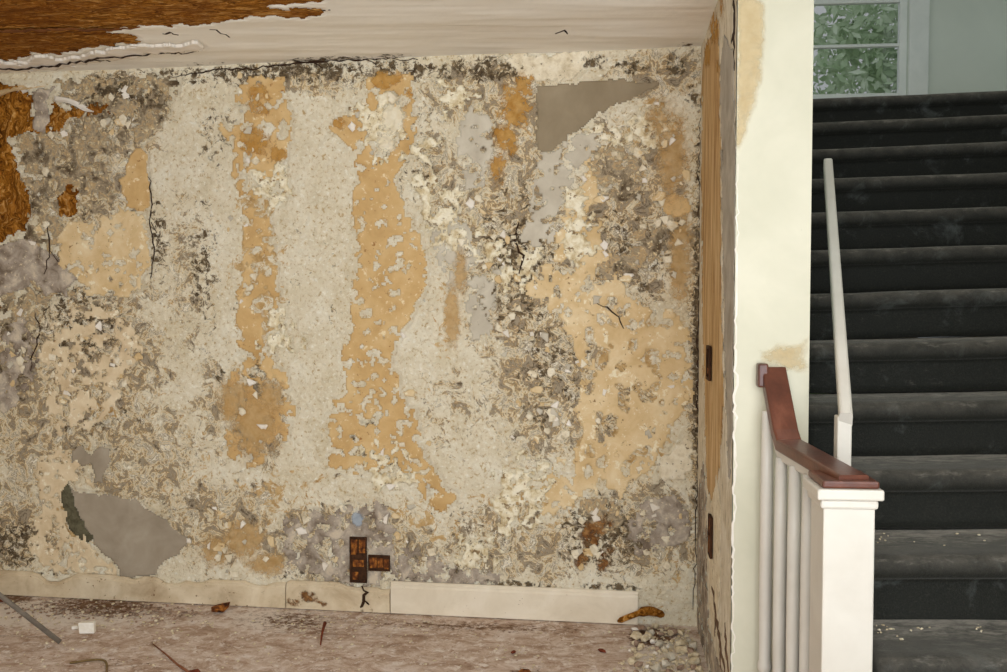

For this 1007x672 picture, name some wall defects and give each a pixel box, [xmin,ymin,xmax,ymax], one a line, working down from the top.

spalling [0,0,324,579]
peeling [282,69,501,587]
damp [486,579,551,587]
damp [584,583,636,591]
peeling [503,20,740,672]
damp [583,52,698,104]
crack [693,98,729,672]